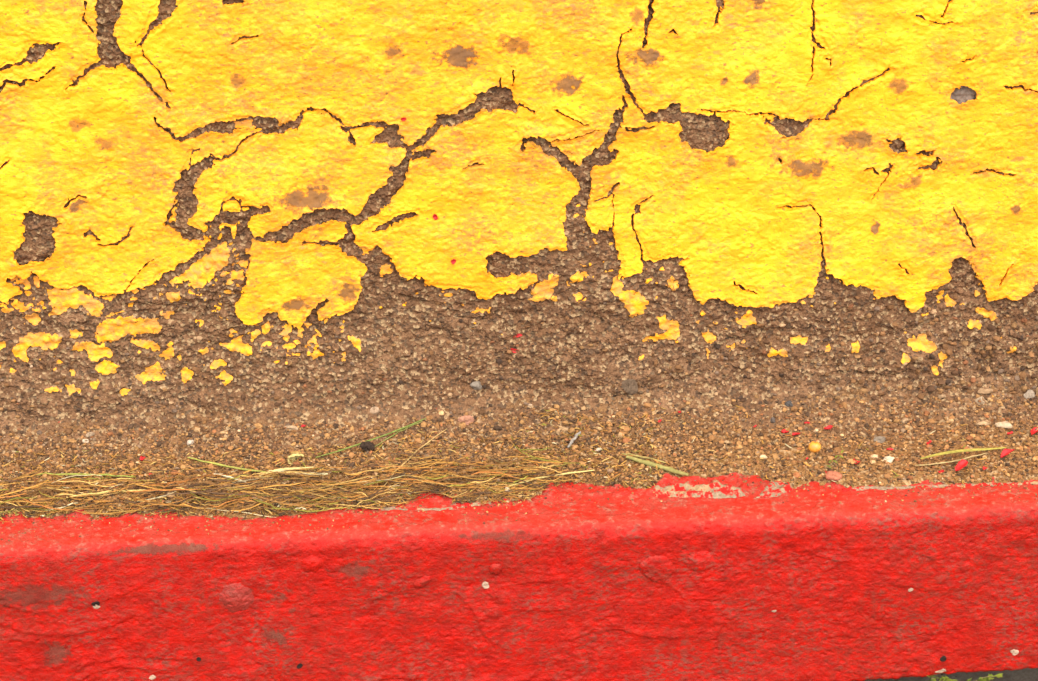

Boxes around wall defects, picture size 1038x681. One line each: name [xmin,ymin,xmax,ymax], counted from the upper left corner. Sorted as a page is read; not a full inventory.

crack [810,0,831,70]
peeling [950,86,977,104]
crack [1004,84,1037,92]
crack [128,0,678,286]
peeling [643,103,747,153]
peeling [882,138,942,172]
crack [973,167,1014,175]
crack [84,227,132,246]
crack [785,204,823,254]
crack [953,207,975,247]
crack [310,299,328,315]
peeling [0,199,1038,440]